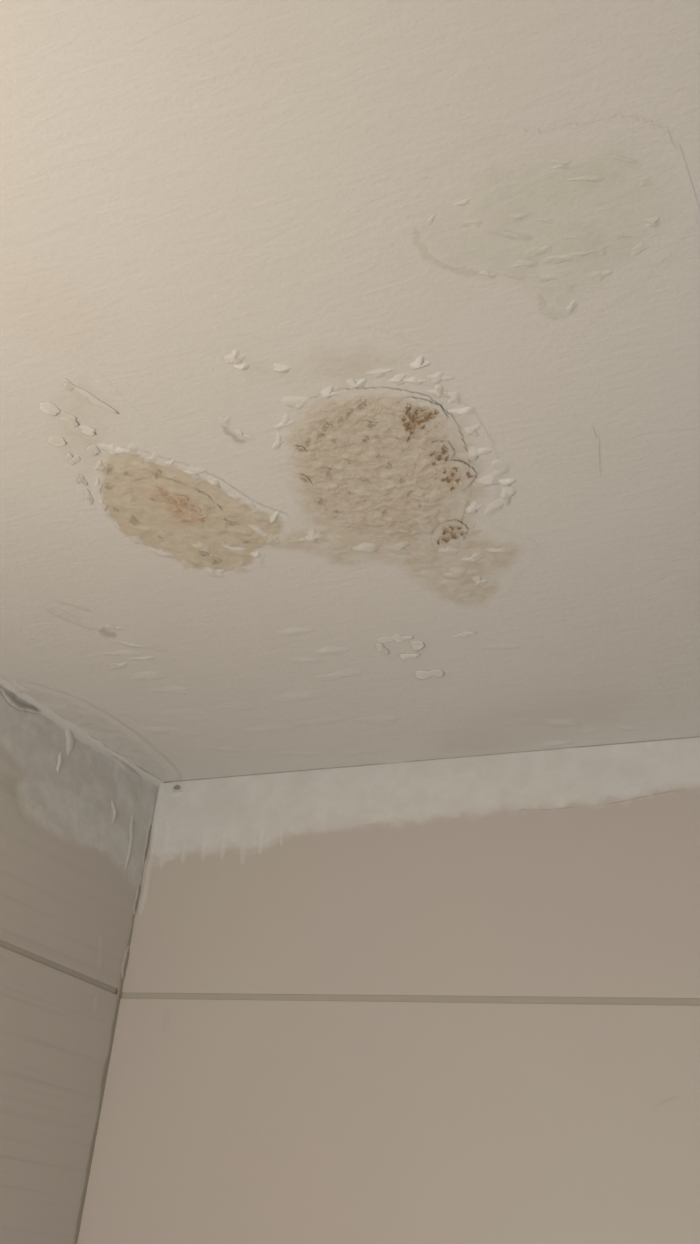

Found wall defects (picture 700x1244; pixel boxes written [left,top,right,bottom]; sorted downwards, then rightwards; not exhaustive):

damp [18,353,539,615]